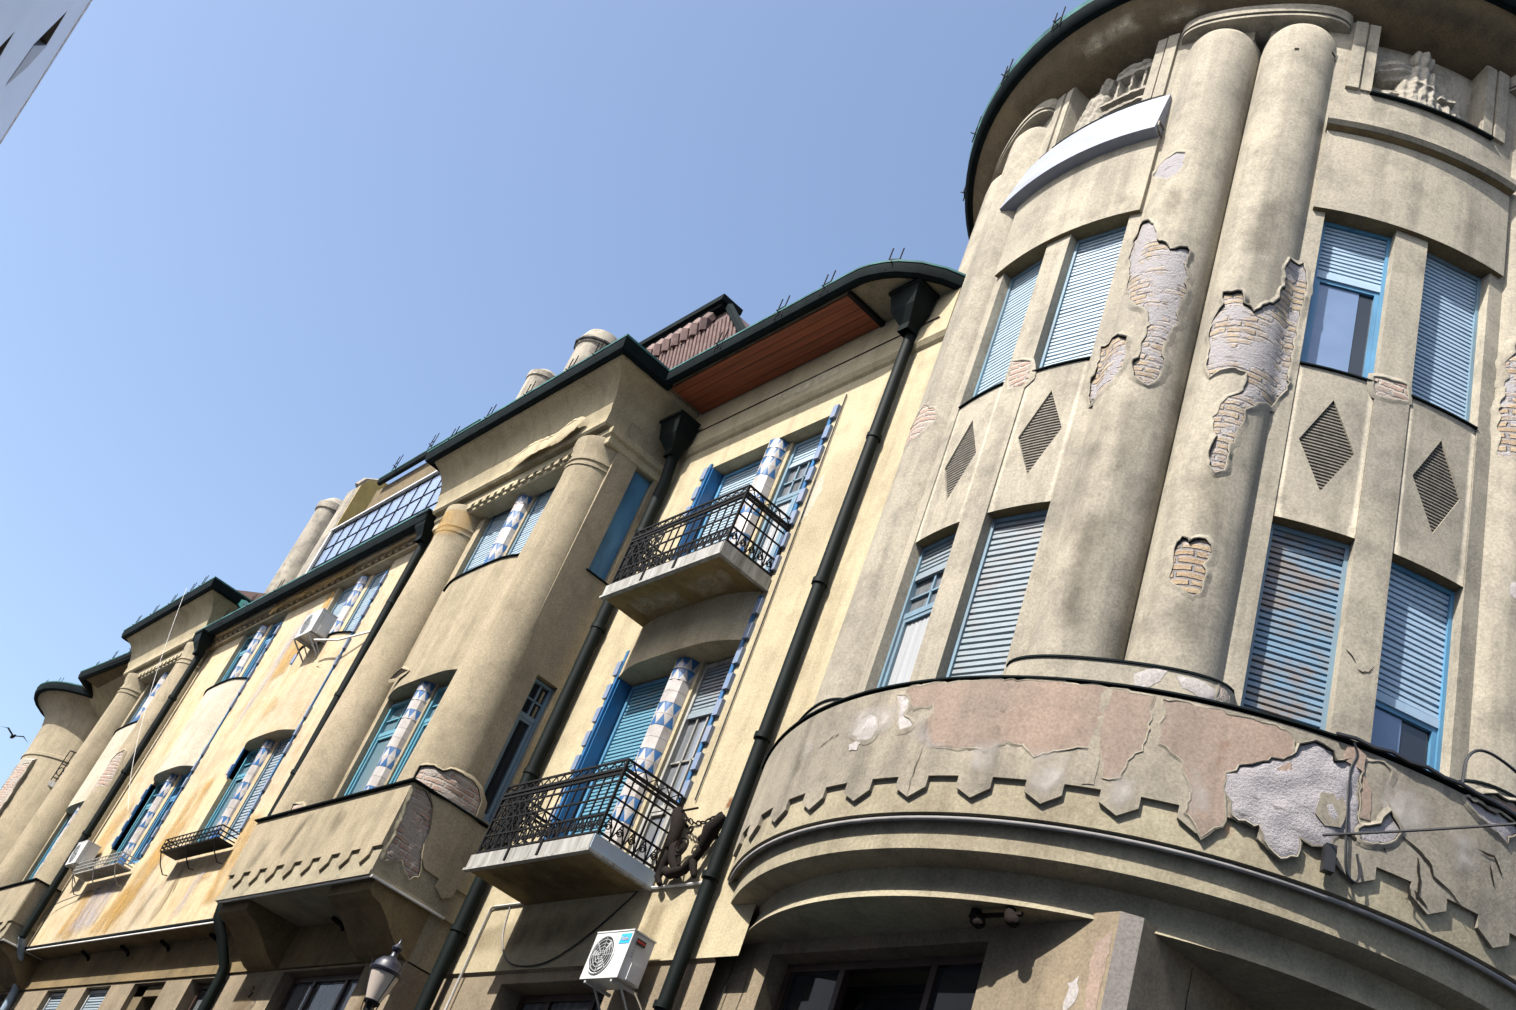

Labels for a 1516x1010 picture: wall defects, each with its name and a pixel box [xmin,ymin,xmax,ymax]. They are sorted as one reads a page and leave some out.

flaking render [1005,357,1036,394]
flaking render [1085,218,1195,408]
flaking render [1202,256,1313,478]
flaking render [1367,373,1412,405]
flaking render [1490,327,1516,460]
flaking render [1163,534,1219,601]
flaking render [379,762,487,884]
peeling [848,669,1406,861]
flaking render [1460,788,1516,849]